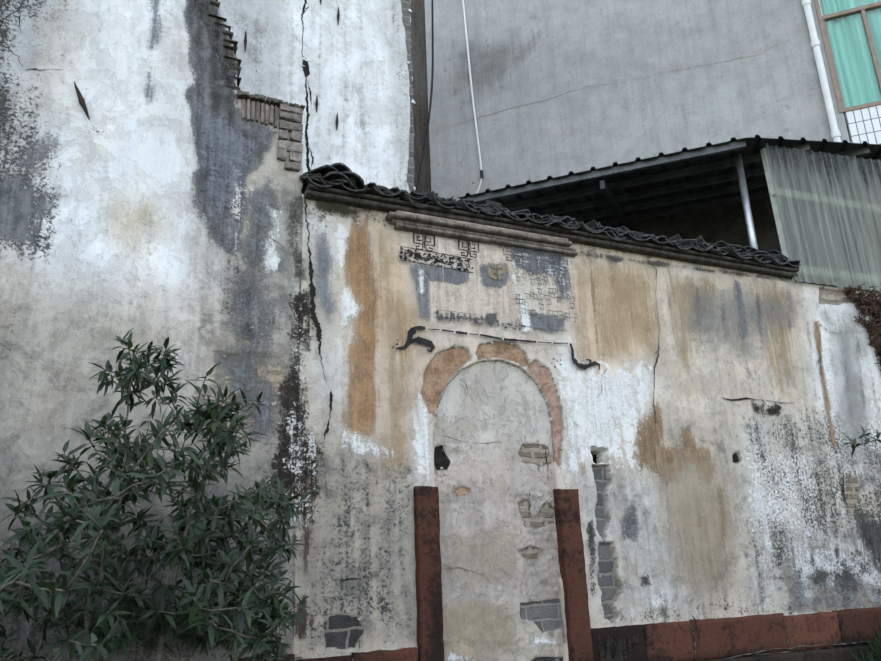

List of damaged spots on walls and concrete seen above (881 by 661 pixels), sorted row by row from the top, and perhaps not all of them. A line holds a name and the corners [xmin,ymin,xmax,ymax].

water stain [150,0,162,49]
crack [301,0,314,171]
water stain [0,131,61,257]
water stain [184,0,358,571]
crack [261,197,333,439]
crack [647,256,660,440]
water stain [752,403,782,417]
spalling [518,498,555,529]
spalling [591,450,624,622]
water stain [788,471,881,602]
spalling [320,615,364,649]
spalling [520,599,562,633]